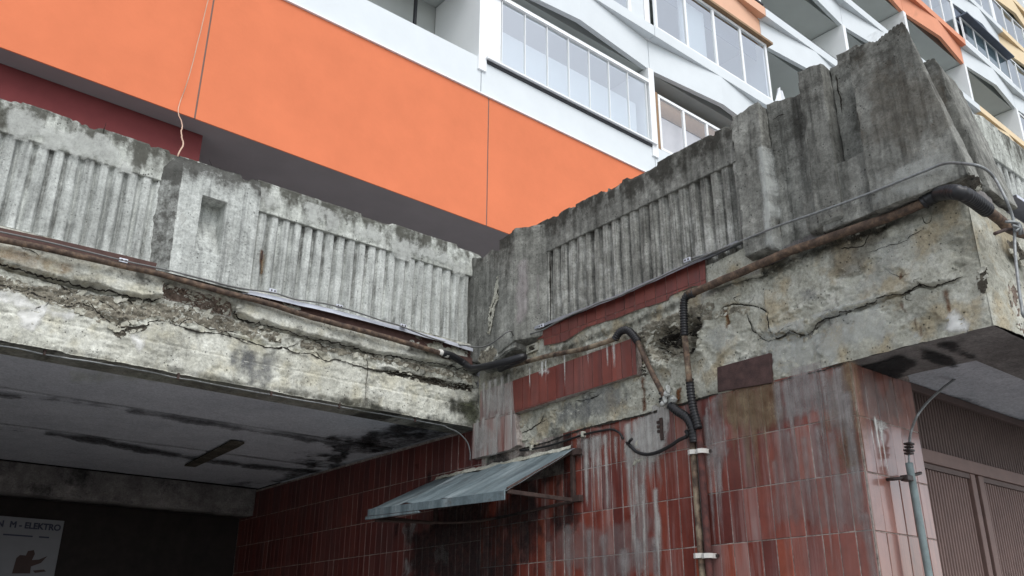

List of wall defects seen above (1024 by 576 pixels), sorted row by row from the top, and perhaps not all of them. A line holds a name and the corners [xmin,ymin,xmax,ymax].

crack [834,76,842,112]
spalling [0,276,282,343]
crack [0,247,470,399]
spalling [630,302,750,377]
crack [723,217,963,342]
water stain [129,411,256,432]
water stain [45,424,426,473]
water stain [450,375,512,465]
water stain [395,406,669,576]
water stain [766,299,975,517]